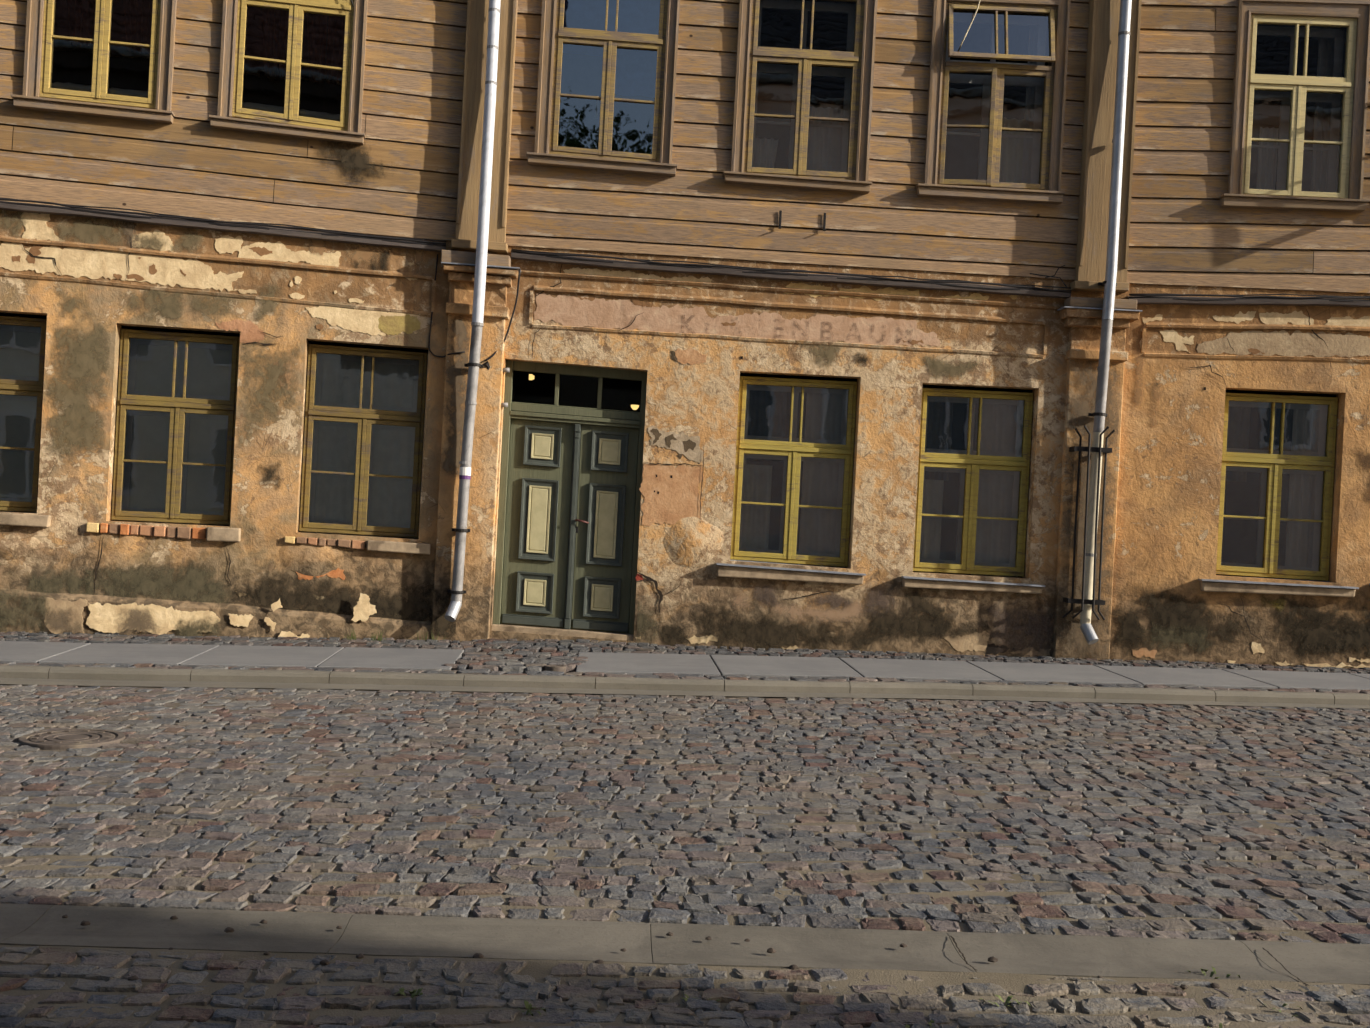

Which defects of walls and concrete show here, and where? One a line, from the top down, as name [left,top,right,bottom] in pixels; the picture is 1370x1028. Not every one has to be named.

peeling [0,212,421,336]
damp [129,290,232,319]
damp [256,286,280,320]
damp [48,290,110,456]
damp [803,344,868,366]
peeling [1140,311,1370,358]
damp [636,356,1370,659]
damp [27,569,98,595]
spalling [43,597,310,638]
damp [235,576,456,638]
spalling [351,593,377,622]